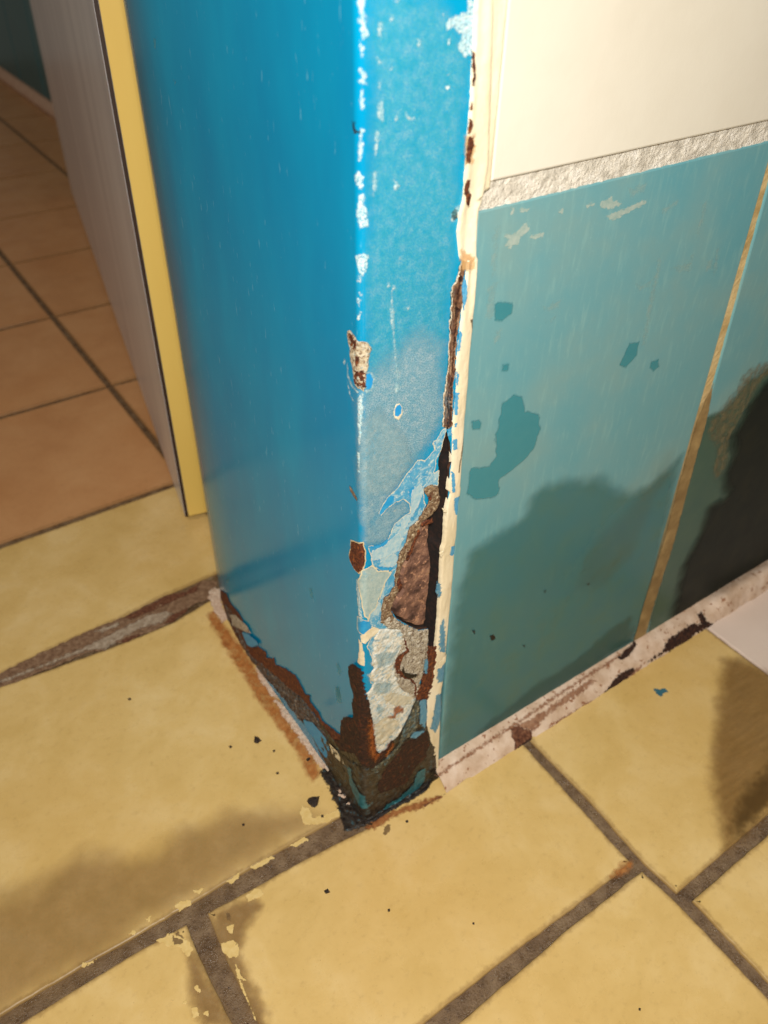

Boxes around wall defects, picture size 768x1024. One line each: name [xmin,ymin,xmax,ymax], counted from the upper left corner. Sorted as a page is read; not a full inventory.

peeling [352,0,384,228]
corrosion [343,330,375,401]
peeling [355,254,369,320]
peeling [349,393,449,685]
corrosion [406,518,433,561]
damp [438,369,768,776]
corrosion [209,590,442,829]